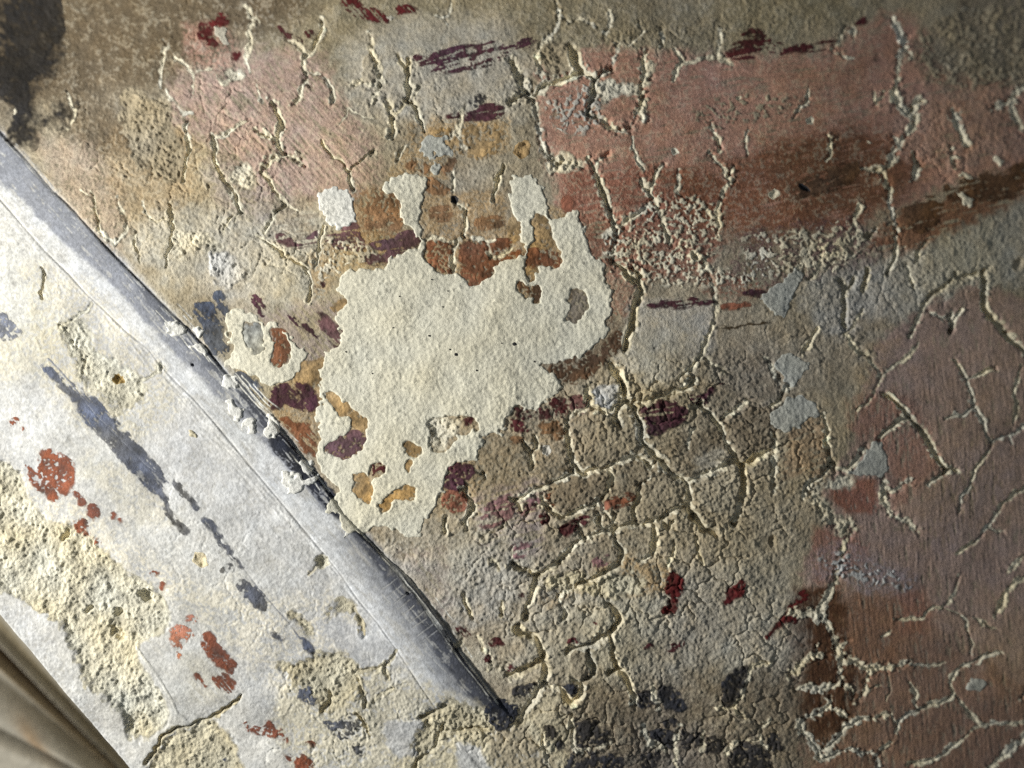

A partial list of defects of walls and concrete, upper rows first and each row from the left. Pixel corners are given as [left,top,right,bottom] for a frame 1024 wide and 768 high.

crack [434,0,452,26]
crack [66,93,77,130]
spalling [228,162,256,190]
crack [79,4,513,305]
peeling [311,236,377,281]
peeling [601,192,865,291]
crack [452,8,1024,768]
spalling [428,416,461,451]
crack [442,473,487,535]
spalling [0,462,243,768]
spalling [275,650,358,713]
crack [412,707,489,768]